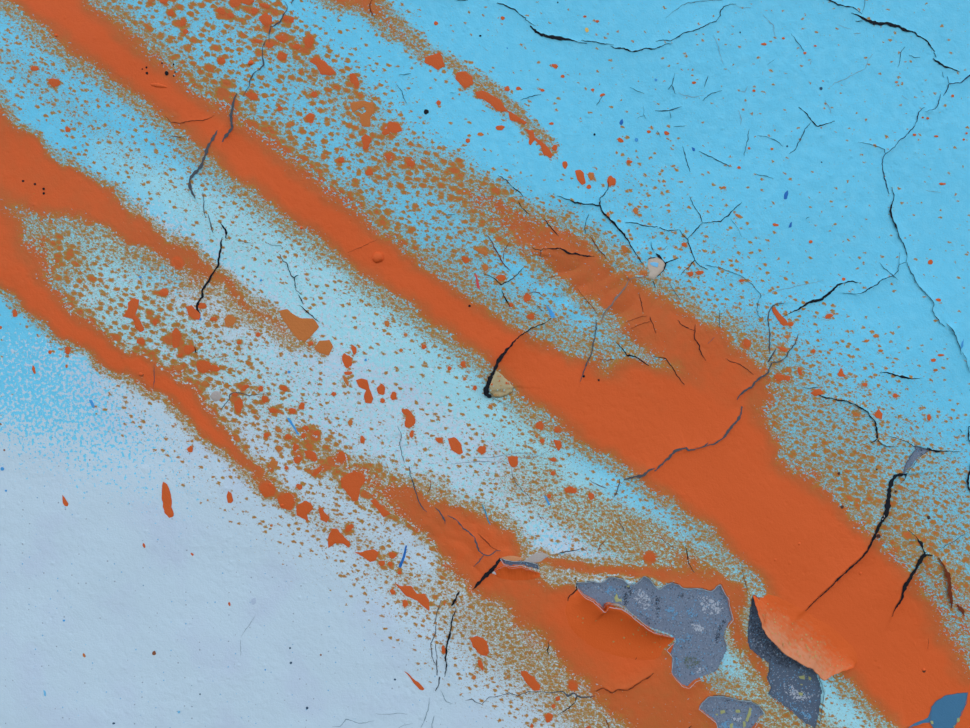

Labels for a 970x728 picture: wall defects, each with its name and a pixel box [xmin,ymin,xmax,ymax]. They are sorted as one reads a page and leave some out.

crack [165,0,319,353]
crack [483,0,970,556]
peeling [490,371,513,397]
crack [333,428,653,728]
peeling [565,576,734,689]
peeling [699,696,764,728]
peeling [748,594,857,728]
crack [807,473,907,610]
crack [893,530,967,615]
peeling [909,692,968,728]